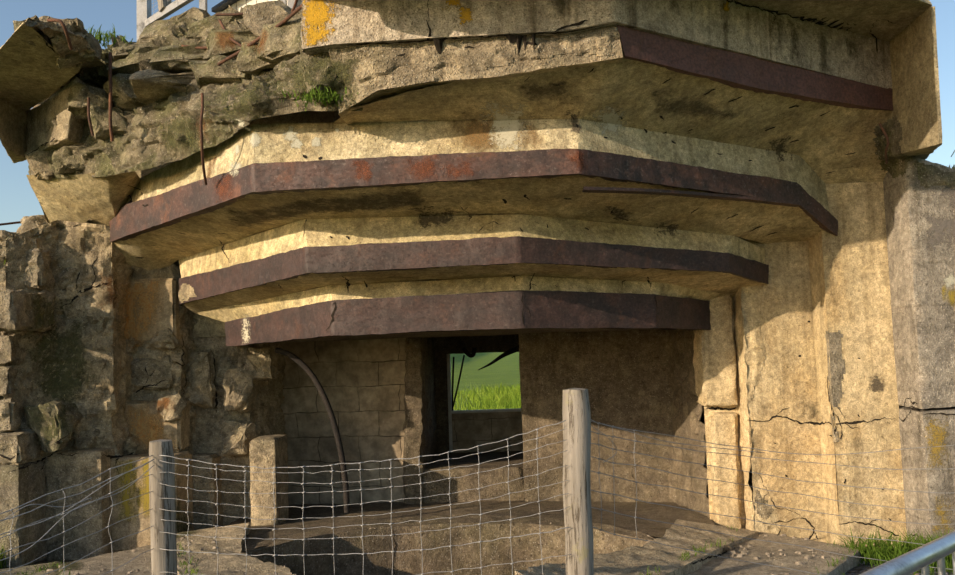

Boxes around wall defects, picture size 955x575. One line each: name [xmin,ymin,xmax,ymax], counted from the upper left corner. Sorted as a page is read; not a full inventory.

spalling [275,0,302,27]
crack [726,0,892,53]
crack [706,377,955,443]
crack [756,474,818,541]
crack [842,520,924,538]